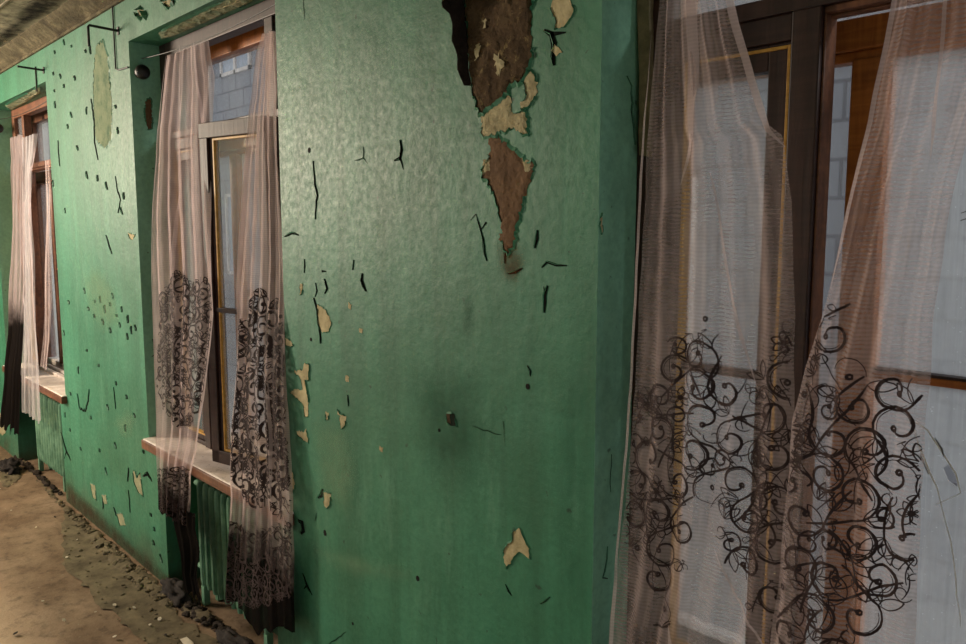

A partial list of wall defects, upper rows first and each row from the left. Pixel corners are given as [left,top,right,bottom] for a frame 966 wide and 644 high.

water stain [0,0,57,43]
peeling [550,0,575,30]
flaking render [441,0,538,258]
peeling [316,304,332,333]
peeling [290,363,310,417]
peeling [297,429,309,443]
peeling [325,409,346,429]
peeling [503,528,531,569]